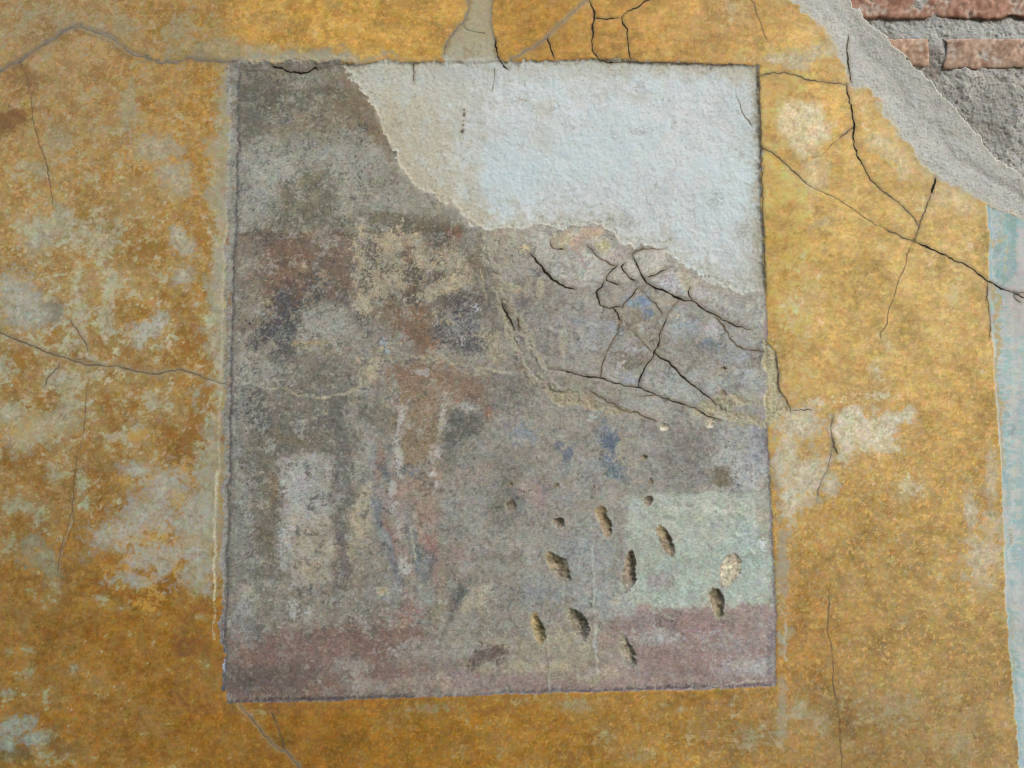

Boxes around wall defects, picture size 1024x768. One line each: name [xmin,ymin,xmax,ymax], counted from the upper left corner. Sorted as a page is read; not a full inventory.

crack [0,321,230,584]
crack [0,25,238,210]
crack [480,268,520,328]
flaking render [342,57,767,423]
spalling [553,517,565,529]
crack [444,0,731,90]
spalling [643,477,654,506]
crack [531,240,838,497]
crack [737,35,1024,343]